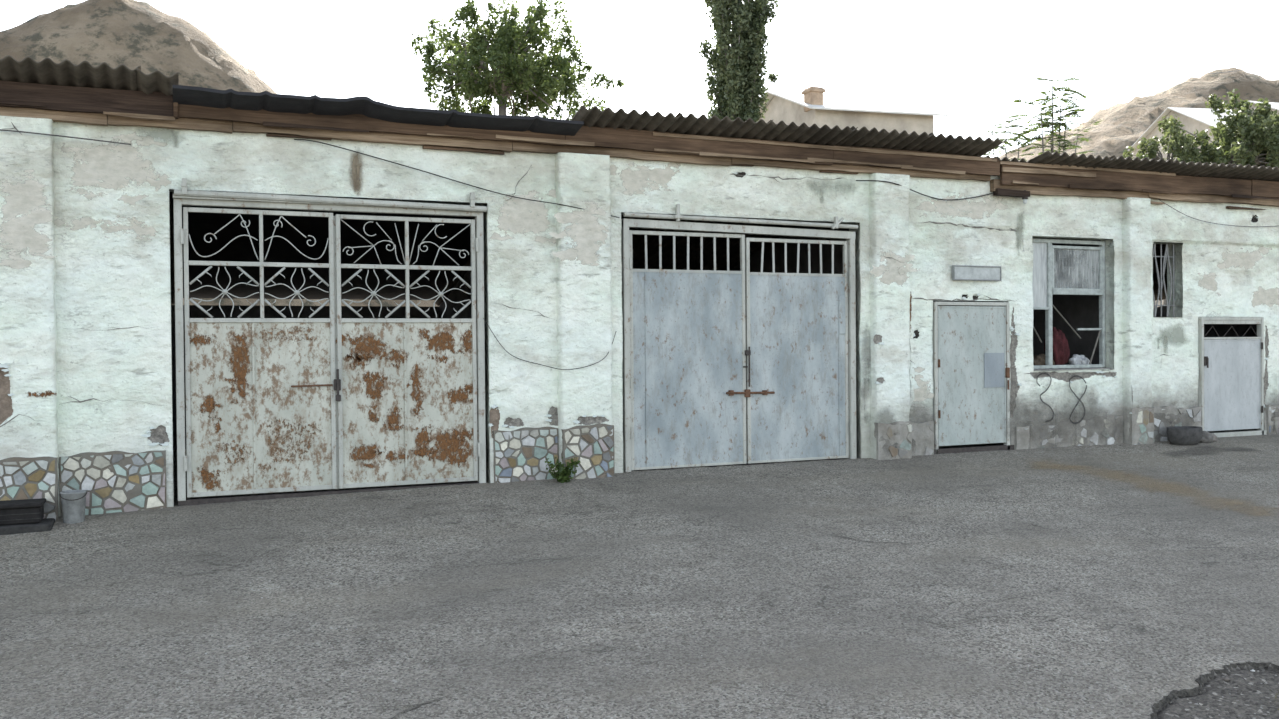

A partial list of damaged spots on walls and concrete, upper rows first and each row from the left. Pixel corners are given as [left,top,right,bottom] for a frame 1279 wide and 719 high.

flaking render [0,363,15,425]
corrosion [184,333,216,347]
corrosion [197,326,321,490]
corrosion [336,325,478,468]